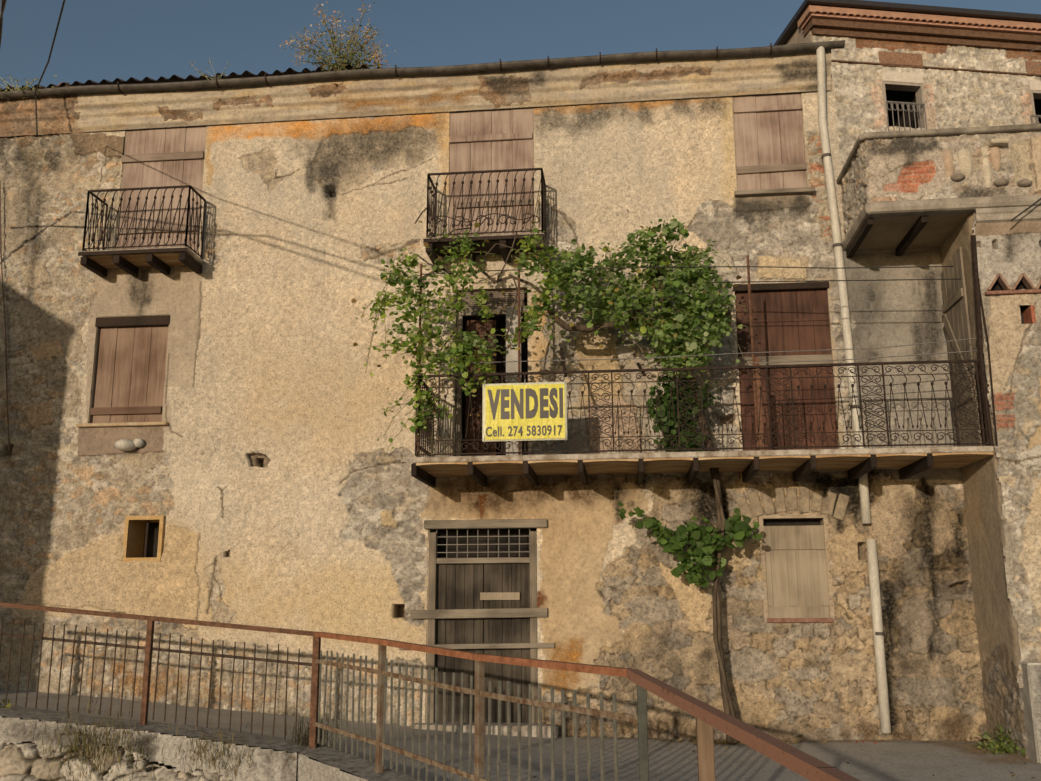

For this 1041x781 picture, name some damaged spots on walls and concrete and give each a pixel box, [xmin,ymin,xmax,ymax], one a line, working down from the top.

damp [307,125,412,216]
crack [341,157,434,195]
flaking render [884,159,937,193]
flaking render [531,131,867,455]
flaking render [0,81,438,726]
flaking render [988,293,1041,429]
flaking render [1017,444,1041,468]
damp [923,483,936,611]
damp [954,511,963,557]
flaking render [538,470,1029,759]
damp [880,567,919,740]